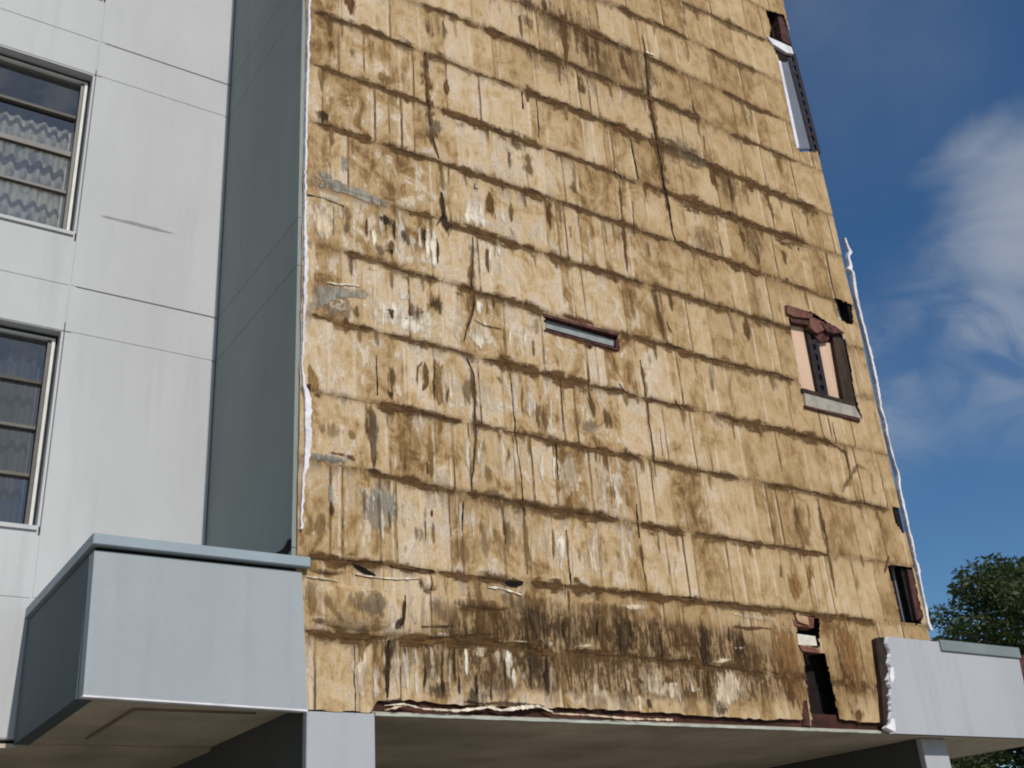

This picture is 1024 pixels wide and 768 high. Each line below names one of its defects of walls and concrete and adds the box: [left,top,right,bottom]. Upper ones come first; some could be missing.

peeling [313,156,439,267]
leakage [314,0,817,277]
crack [619,35,676,272]
peeling [310,282,442,333]
crack [420,52,501,531]
leakage [547,250,793,384]
peeling [357,483,429,542]
leakage [312,313,695,493]
leakage [468,466,618,546]
leakage [476,403,739,487]
leakage [640,505,828,560]
leakage [306,539,875,714]